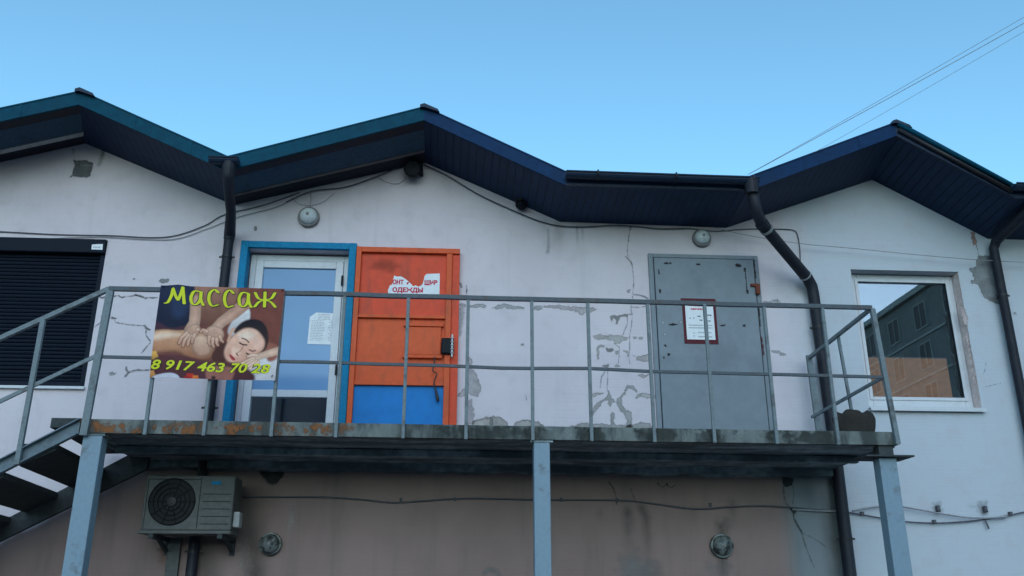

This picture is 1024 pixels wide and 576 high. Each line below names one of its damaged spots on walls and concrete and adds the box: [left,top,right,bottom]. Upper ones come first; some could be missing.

spalling [70,160,93,178]
spalling [969,232,999,304]
crack [96,294,157,377]
peeling [459,304,596,334]
crack [600,237,647,385]
rust [80,419,141,433]
rust [153,421,203,434]
rust [224,422,332,435]
peeling [457,357,544,426]
peeling [570,314,655,428]